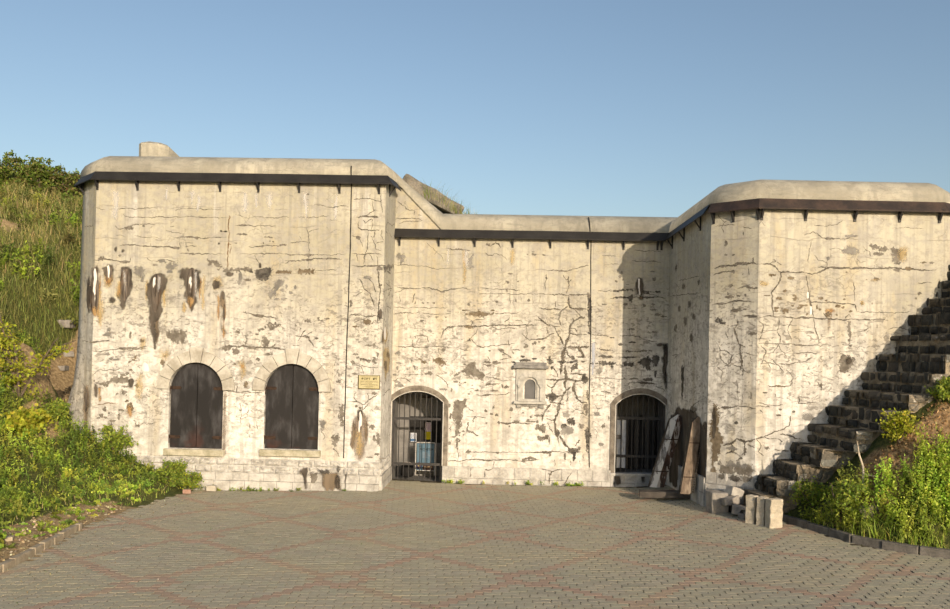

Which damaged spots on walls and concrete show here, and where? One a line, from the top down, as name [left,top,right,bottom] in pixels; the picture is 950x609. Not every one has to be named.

rust [217,292,226,338]
crack [84,196,678,485]
spalling [393,335,660,458]
water stain [669,403,723,487]
crack [673,215,932,461]